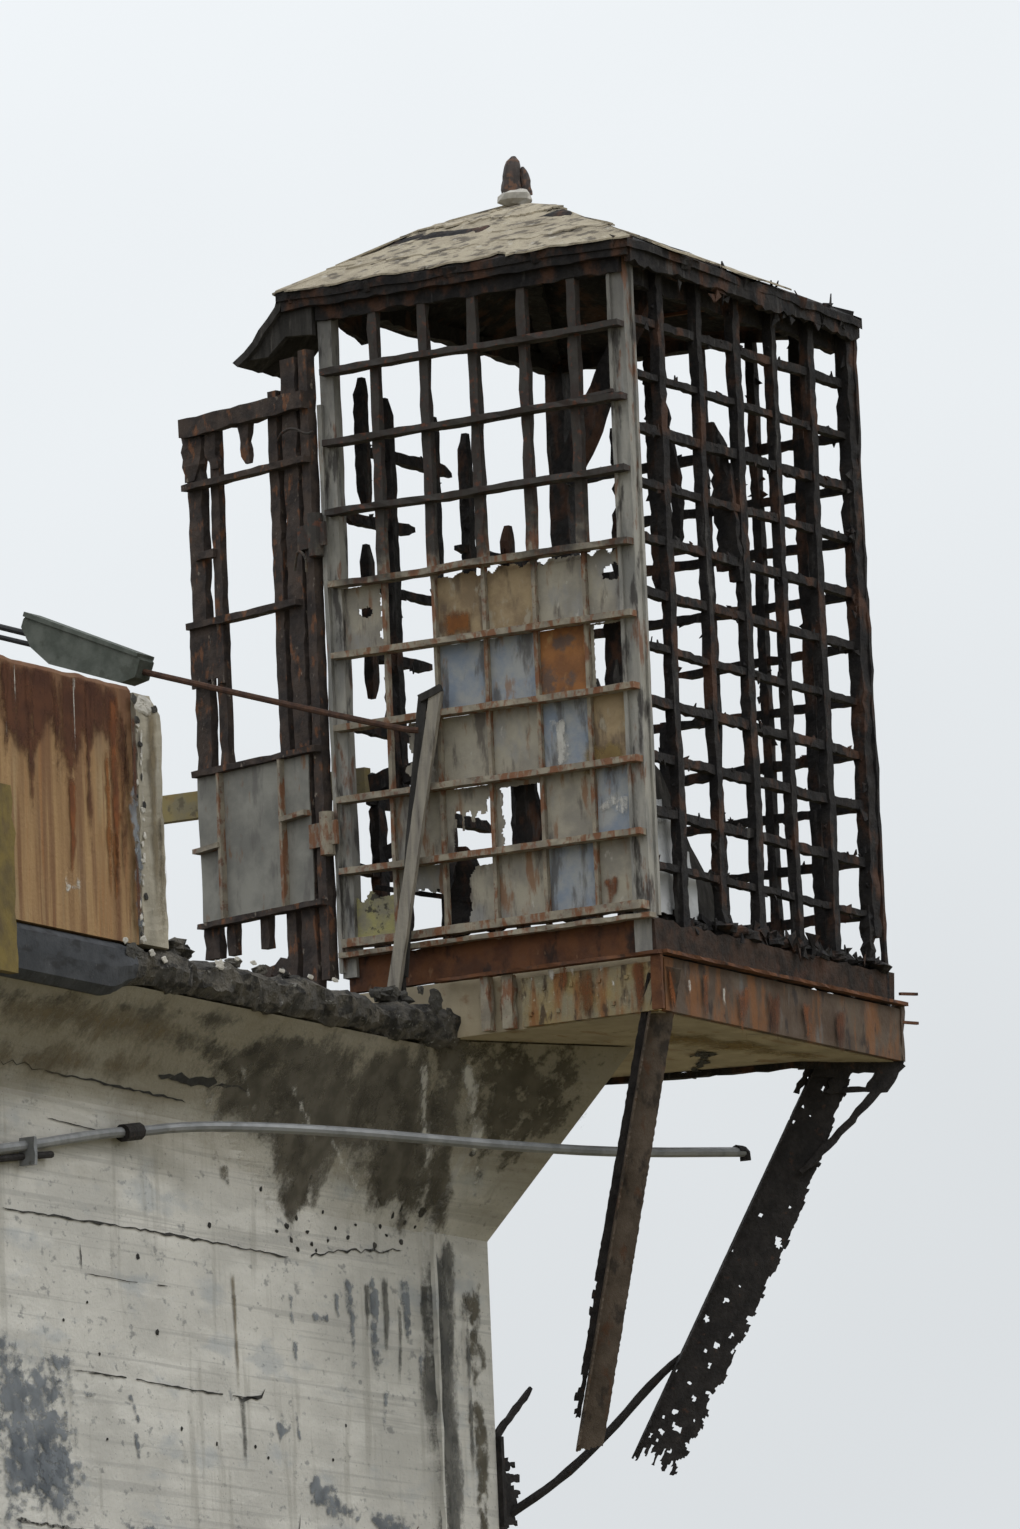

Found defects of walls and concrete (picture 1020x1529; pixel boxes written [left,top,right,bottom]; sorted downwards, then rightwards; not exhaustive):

corrosion [444,611,469,634]
corrosion [0,662,141,919]
corrosion [604,876,617,903]
spalling [215,956,257,970]
spalling [393,986,454,1017]
corrosion [632,962,644,1011]
corrosion [669,1036,807,1058]
crack [3,1207,402,1286]
water stain [0,991,579,1529]
crack [18,1517,81,1529]